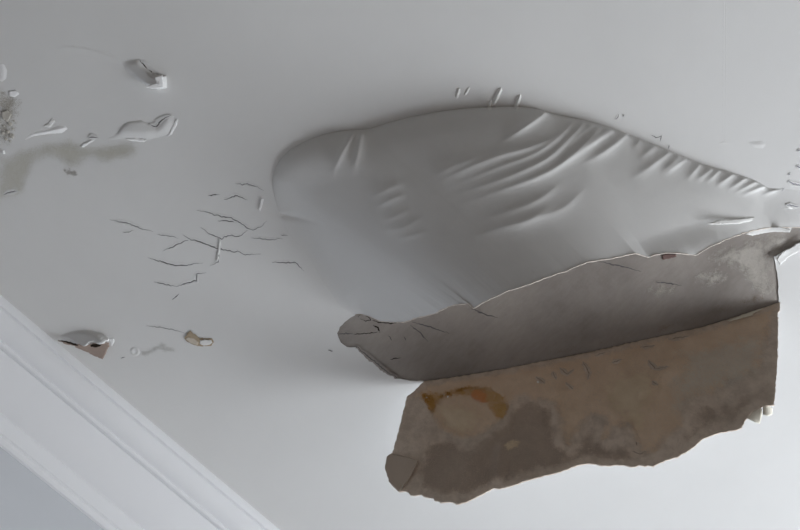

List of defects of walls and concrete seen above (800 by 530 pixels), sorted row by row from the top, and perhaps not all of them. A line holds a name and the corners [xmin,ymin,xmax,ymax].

damp [0,91,140,200]
peeling [81,115,178,147]
crack [110,181,304,300]
peeling [184,331,214,347]
peeling [337,228,800,505]
damp [420,400,633,494]